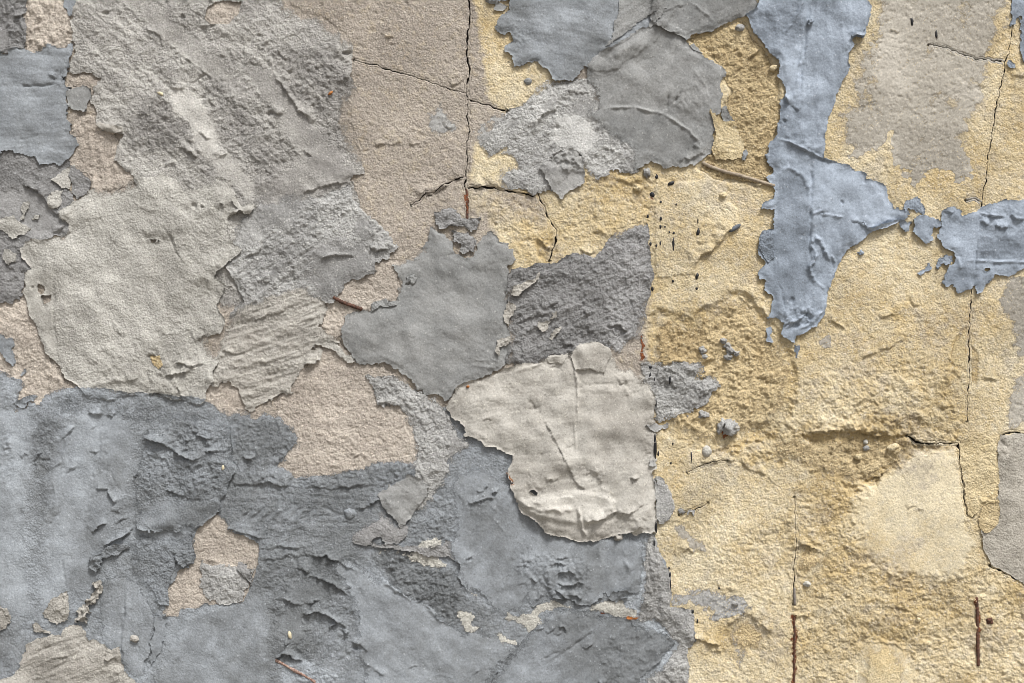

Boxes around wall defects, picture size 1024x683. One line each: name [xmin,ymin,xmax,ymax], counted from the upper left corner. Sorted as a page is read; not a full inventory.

peeling [0,114,134,265]
crack [354,0,559,260]
spalling [689,21,780,183]
crack [929,0,1015,209]
peeling [0,289,78,408]
peeling [273,259,419,479]
spalling [646,304,792,442]
crack [907,287,974,518]
crack [1000,428,1024,436]
peeling [162,512,260,618]
rust [790,615,798,683]
crack [989,565,1024,585]